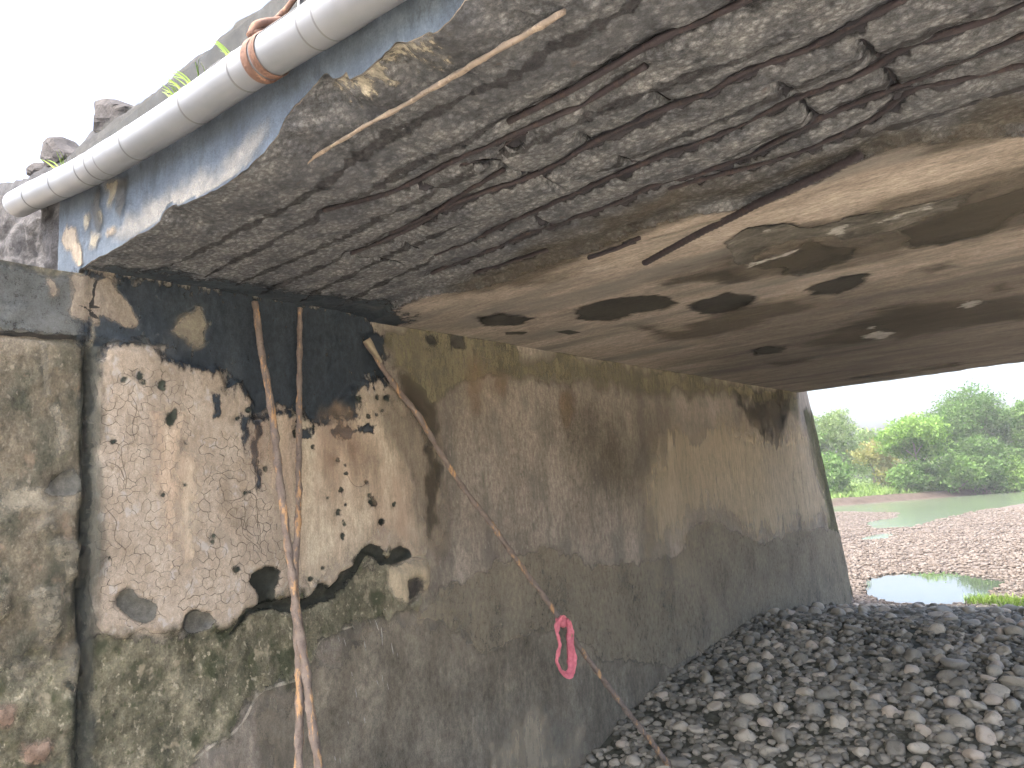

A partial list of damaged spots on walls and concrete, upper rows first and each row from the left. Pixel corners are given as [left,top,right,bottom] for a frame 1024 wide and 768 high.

crack [0,331,320,713]
peeling [0,343,430,768]
water stain [0,263,443,768]
water stain [449,334,465,350]
water stain [479,313,534,335]
spalling [46,0,1024,404]
water stain [255,352,852,768]
water stain [751,346,807,365]
water stain [557,169,1024,346]